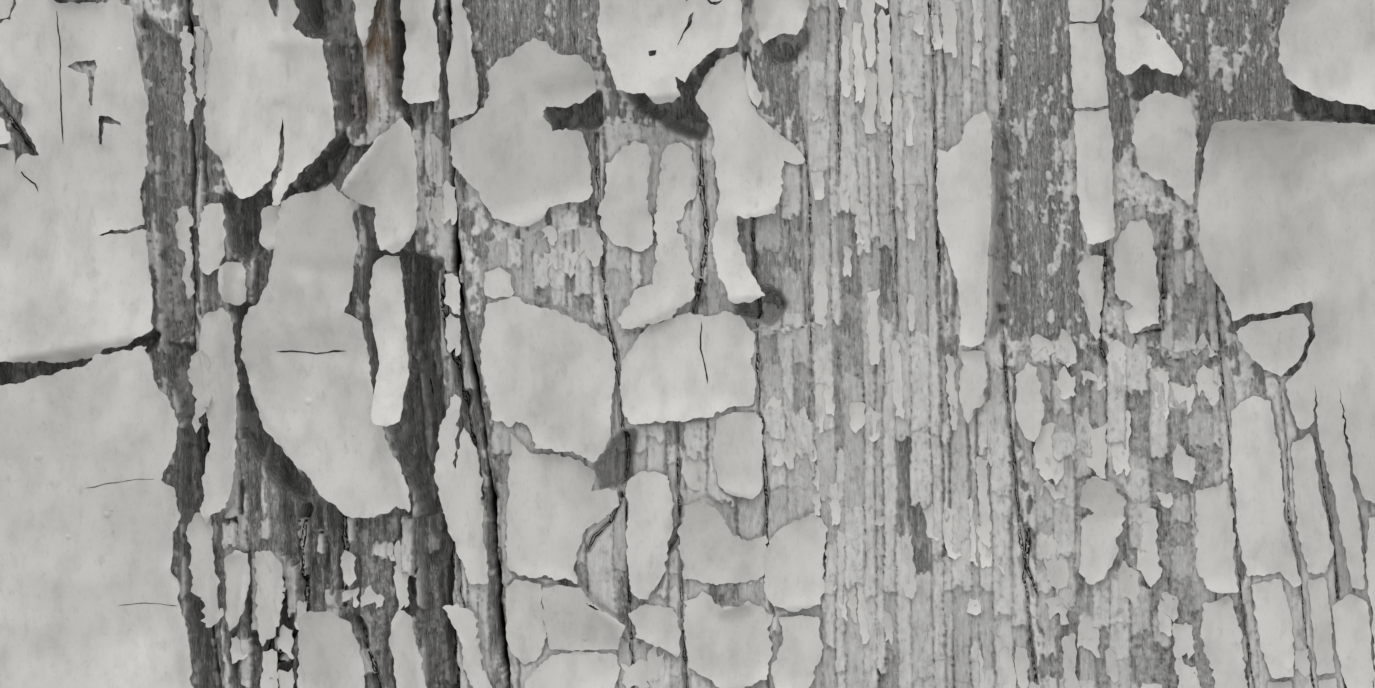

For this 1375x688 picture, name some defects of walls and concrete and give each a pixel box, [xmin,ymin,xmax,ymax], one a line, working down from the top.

peeling [0,0,905,688]
peeling [838,0,983,241]
peeling [901,0,1375,688]